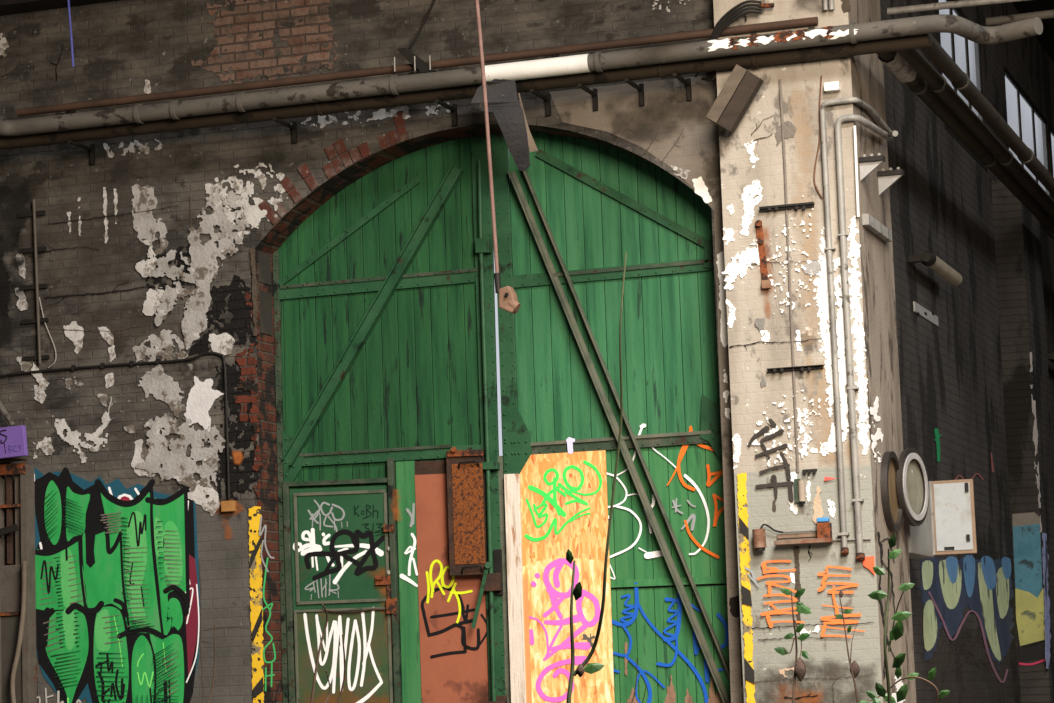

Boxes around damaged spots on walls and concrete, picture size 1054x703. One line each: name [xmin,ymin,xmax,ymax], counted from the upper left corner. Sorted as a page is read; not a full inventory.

rust [728,34,760,50]
rust [773,29,807,43]
peeling [63,321,84,354]
peeling [716,140,883,524]
peeling [16,327,116,463]